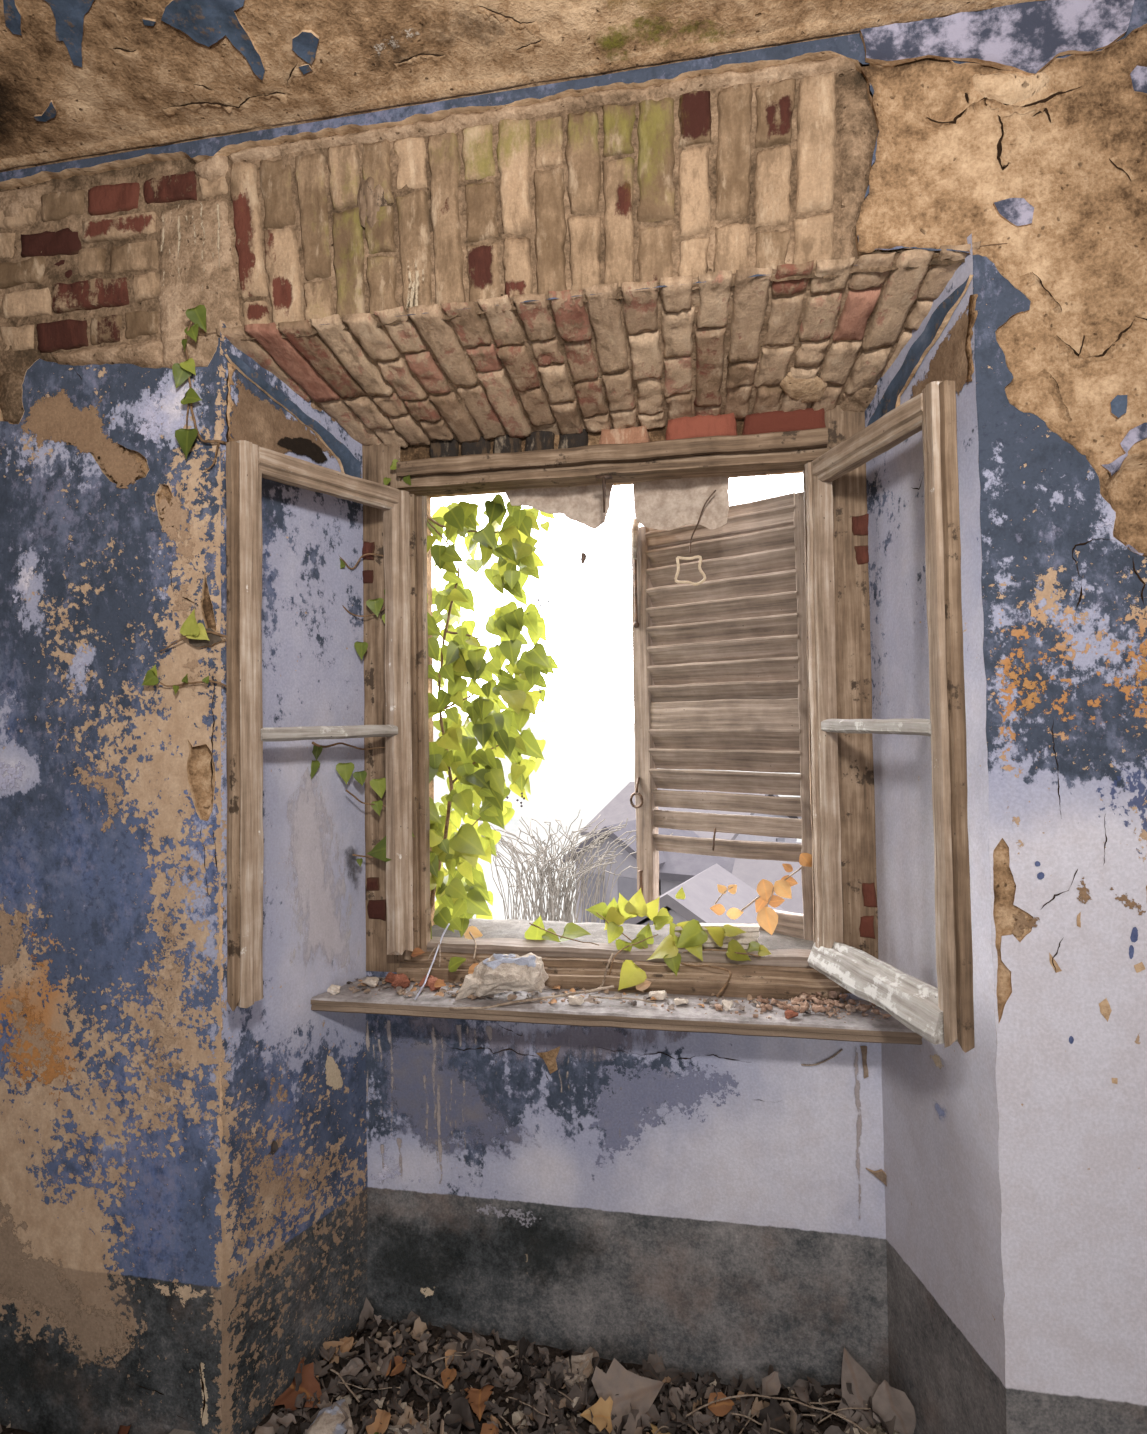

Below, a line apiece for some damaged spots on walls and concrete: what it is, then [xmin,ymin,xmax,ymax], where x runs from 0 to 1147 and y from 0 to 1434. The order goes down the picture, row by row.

crack [926,86,1085,170]
crack [1109,154,1138,181]
flaking render [0,0,1147,637]
crack [965,294,978,382]
crack [1014,272,1147,423]
flaking render [366,877,386,921]
peeling [154,1283,214,1307]
peeling [217,1053,349,1318]
damp [366,1020,402,1181]
damp [474,1204,593,1286]
damp [412,1017,688,1183]
damp [854,1052,862,1218]